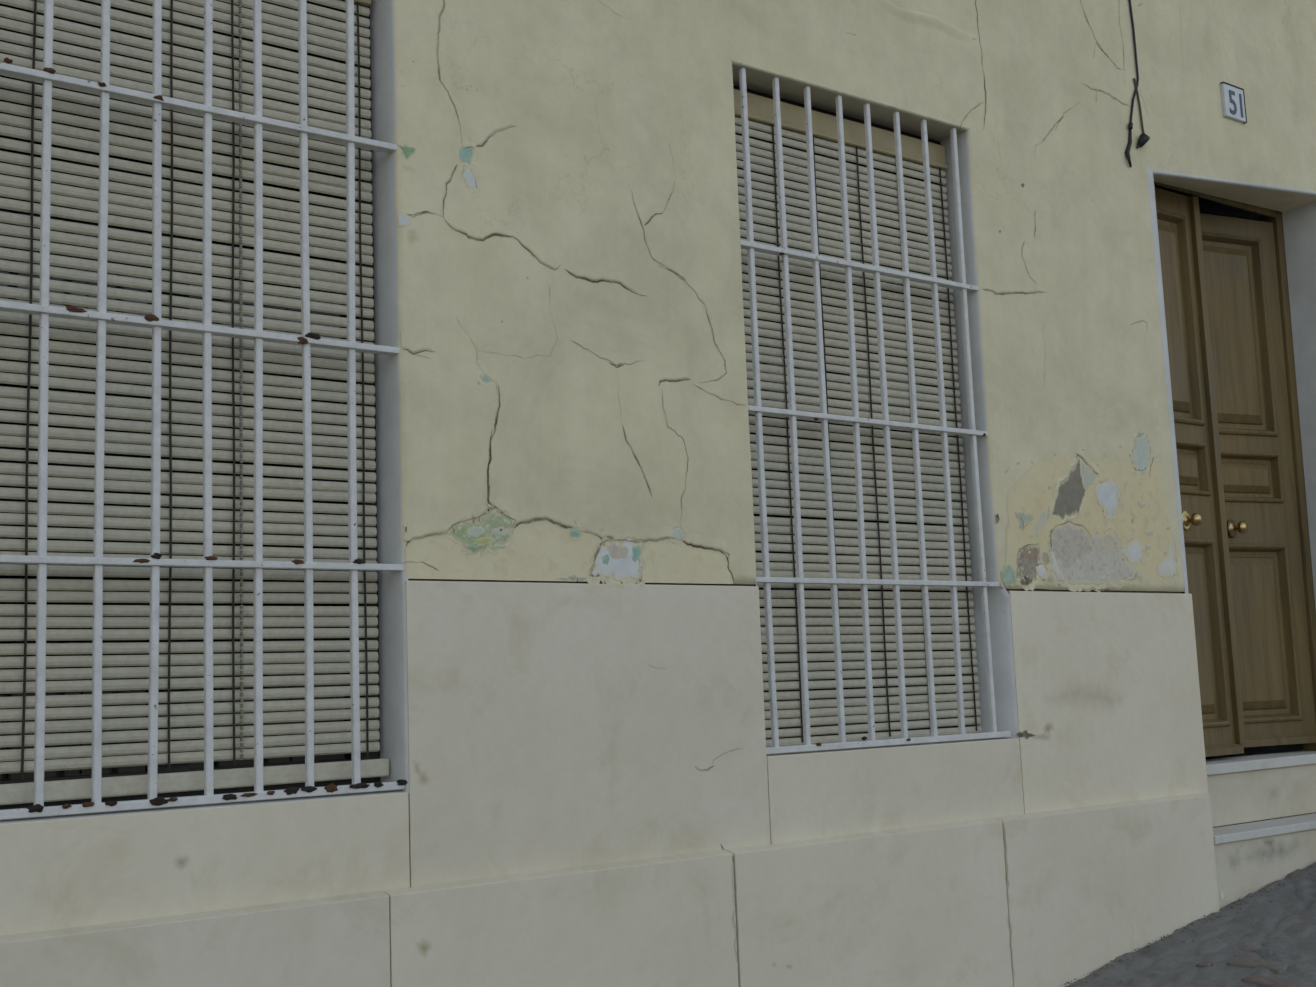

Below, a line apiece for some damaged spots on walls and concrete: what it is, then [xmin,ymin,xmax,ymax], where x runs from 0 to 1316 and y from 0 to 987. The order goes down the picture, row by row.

crack [969,0,986,124]
crack [431,166,645,296]
rust [297,333,321,345]
crack [658,368,690,385]
crack [487,389,514,520]
peeling [996,448,1144,592]
peeling [405,502,738,589]
rust [222,779,407,800]
rust [26,804,44,813]
rust [62,801,118,809]
rust [149,797,178,806]